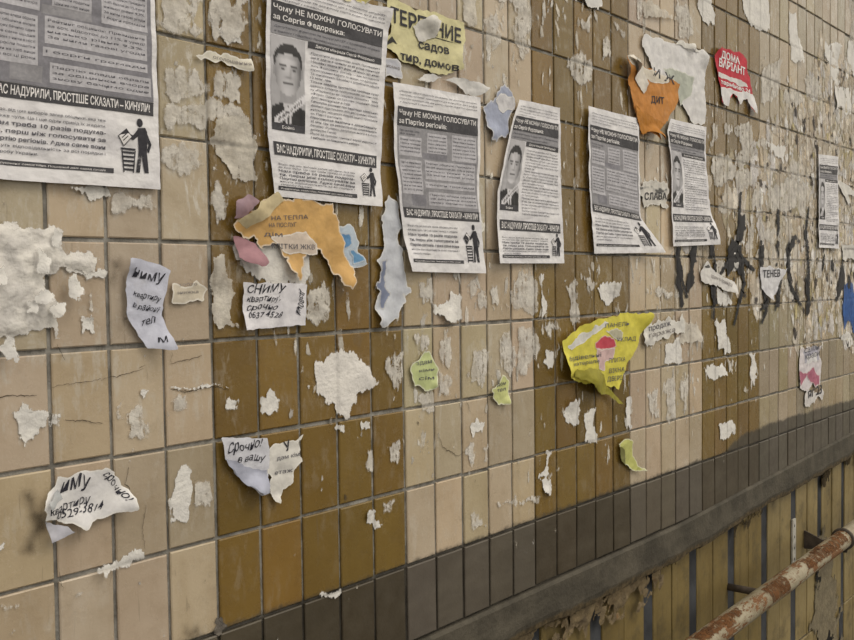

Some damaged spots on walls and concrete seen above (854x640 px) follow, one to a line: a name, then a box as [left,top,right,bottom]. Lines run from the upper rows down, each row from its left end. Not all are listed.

rust [800,532,848,569]
spalling [517,563,676,640]
rust [761,575,791,602]
rust [692,607,742,640]